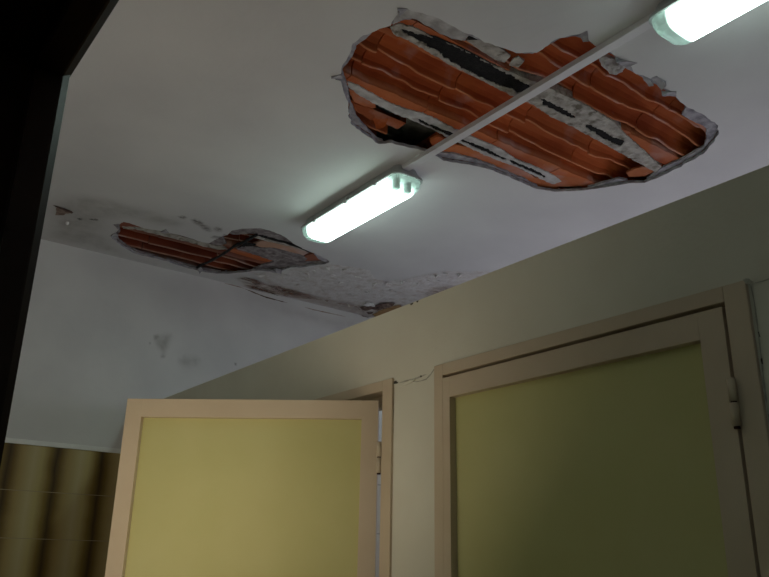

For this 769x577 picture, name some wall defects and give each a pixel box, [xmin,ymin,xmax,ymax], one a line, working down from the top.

spalling [331,8,718,189]
peeling [111,222,490,318]